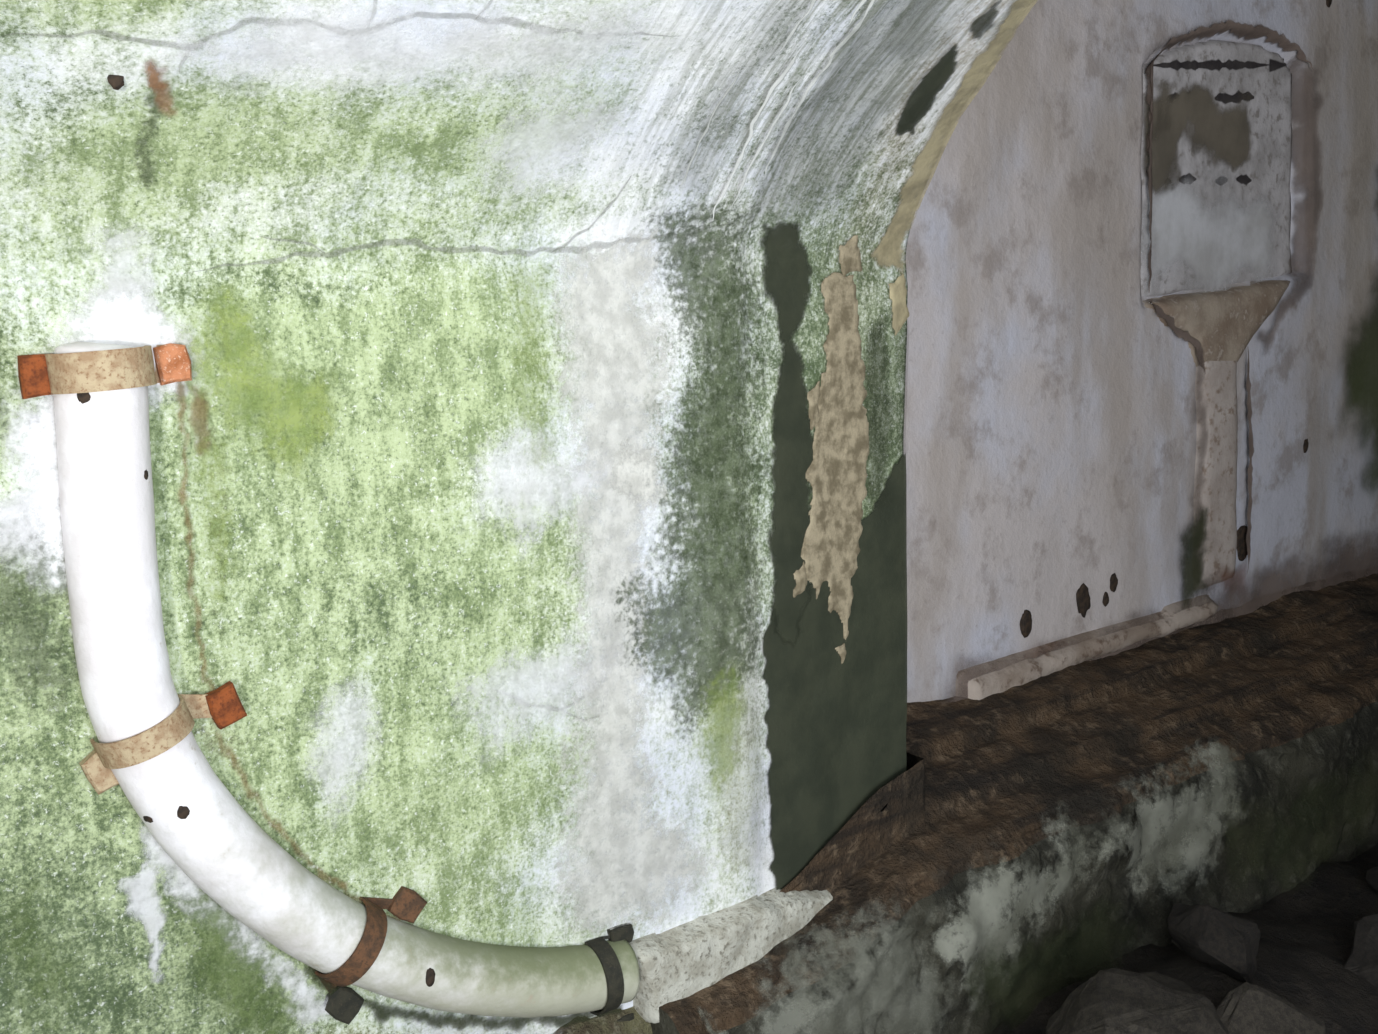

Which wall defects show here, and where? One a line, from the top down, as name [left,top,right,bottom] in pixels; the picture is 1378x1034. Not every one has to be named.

rust [136,61,173,183]
water stain [1145,20,1323,371]
water stain [66,241,200,399]
peeling [793,0,1037,664]
water stain [0,395,67,588]
water stain [486,232,705,929]
spalling [1076,573,1118,618]
water stain [1086,350,1378,661]
water stain [120,829,338,1023]
water stain [362,1001,622,1030]
water stain [761,931,911,1034]
water stain [933,743,1242,1004]